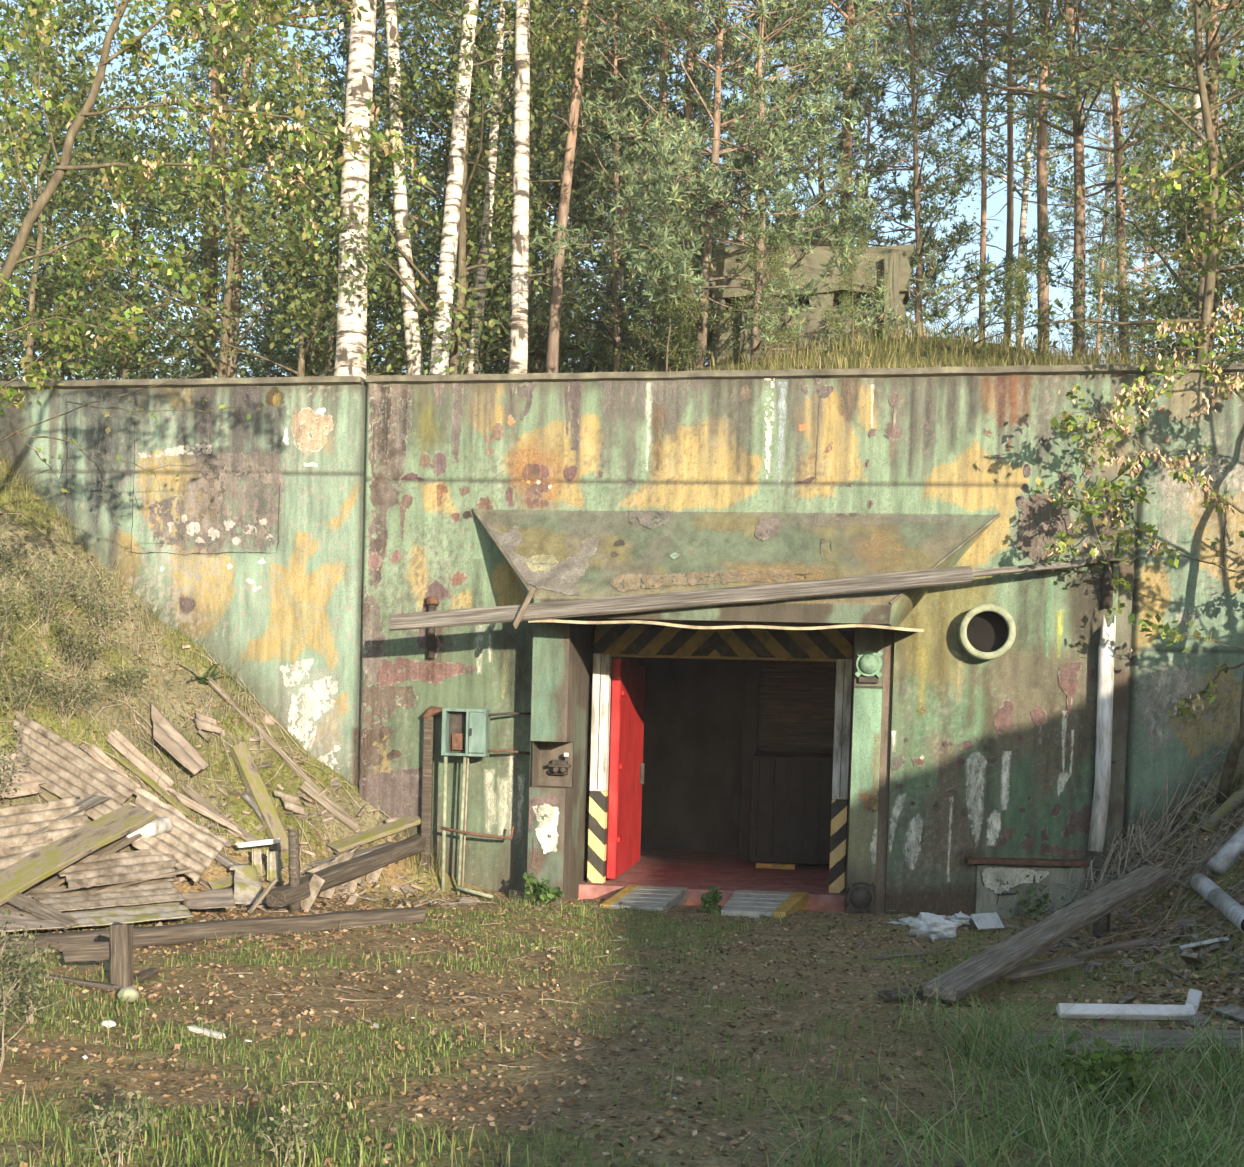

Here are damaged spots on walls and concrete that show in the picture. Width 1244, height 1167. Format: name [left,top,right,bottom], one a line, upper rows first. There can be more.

leakage [602,378,787,484]
peeling [138,407,334,569]
peeling [627,510,671,530]
peeling [358,381,600,830]
peeling [610,552,797,592]
spalling [280,658,341,770]
spalling [529,795,562,871]
peeling [991,803,1092,856]
spalling [982,867,1049,895]